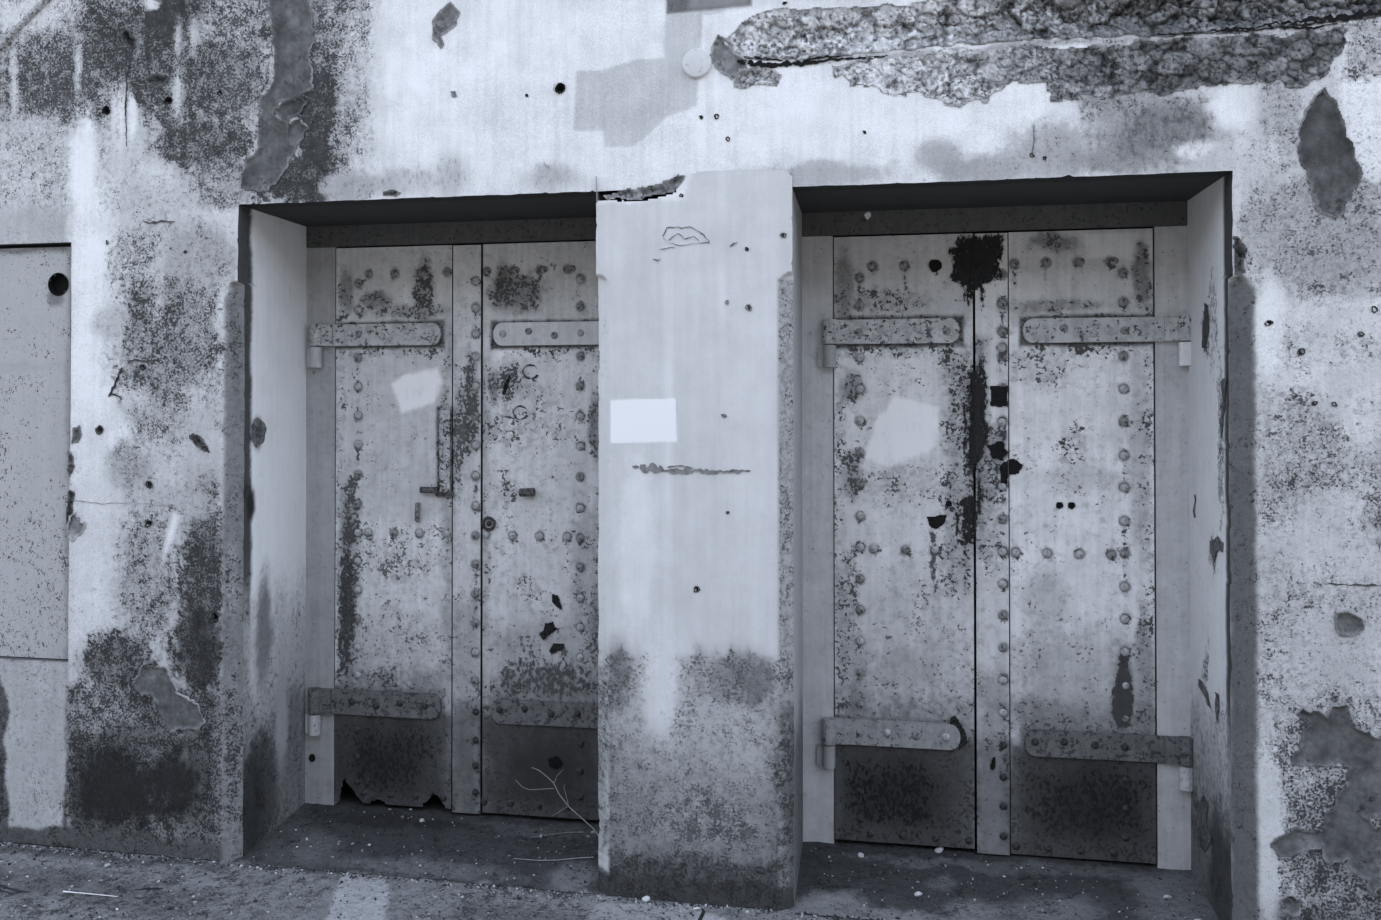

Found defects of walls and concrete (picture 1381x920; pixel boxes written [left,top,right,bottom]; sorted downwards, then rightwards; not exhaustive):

peeling [432,2,460,49]
peeling [240,0,315,192]
spalling [710,0,1381,219]
spalling [603,174,685,200]
corrosion [929,232,1005,318]
corrosion [927,353,1023,593]
corrosion [336,552,358,676]
peeling [132,664,206,733]
corrosion [1111,649,1134,728]
leakage [70,745,200,827]
peeling [1271,701,1381,898]